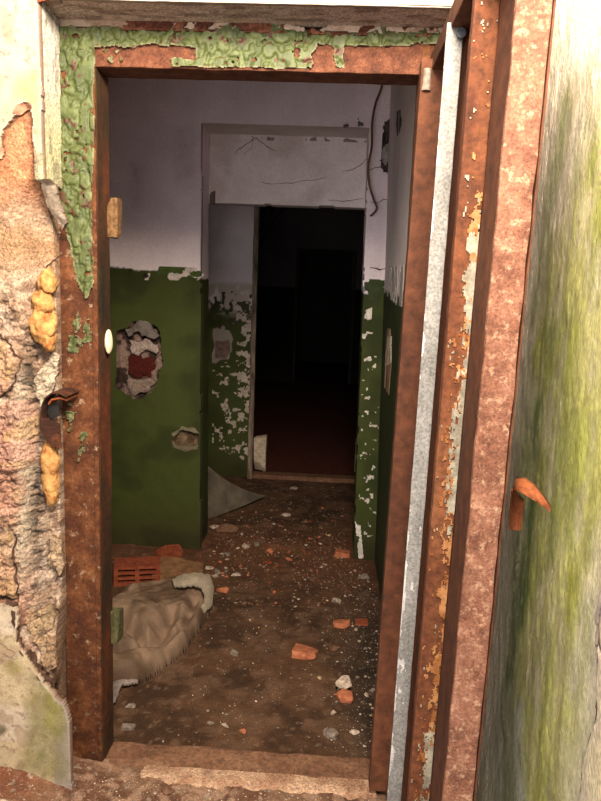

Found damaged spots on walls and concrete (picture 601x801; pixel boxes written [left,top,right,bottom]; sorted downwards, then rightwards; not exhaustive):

crack [262,159,388,184]
rust [467,190,483,241]
crack [0,336,23,398]
flaking render [0,19,443,685]
rust [448,316,471,412]
crack [0,535,55,690]
rust [400,561,414,636]
rust [417,425,459,769]
damp [507,498,535,694]
rust [394,658,407,711]